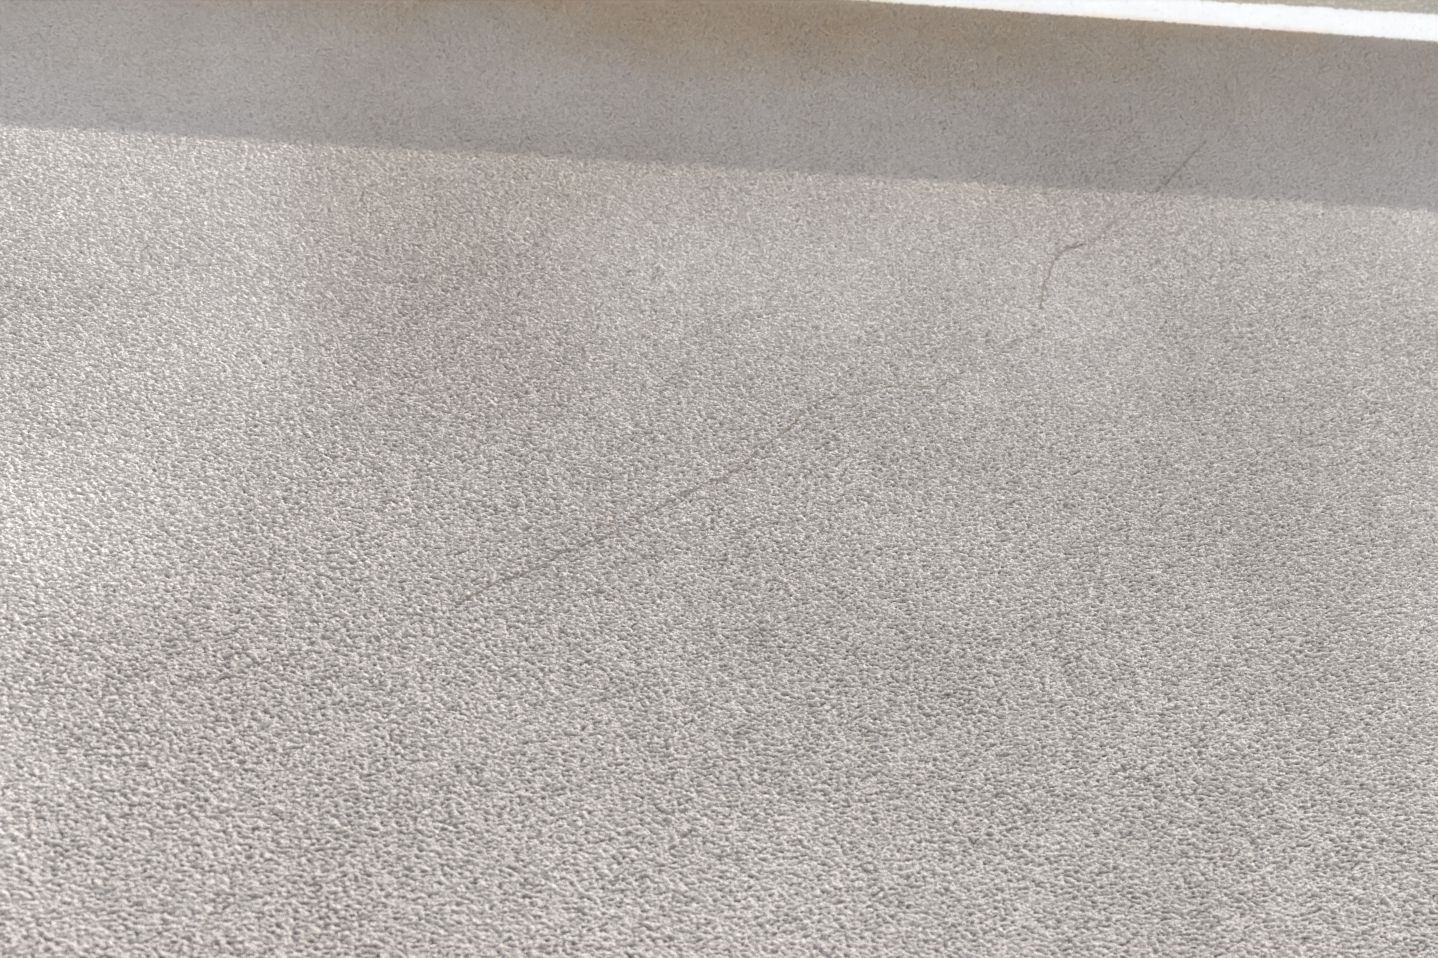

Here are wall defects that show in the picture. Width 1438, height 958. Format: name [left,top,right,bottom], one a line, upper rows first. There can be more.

crack [1000,140,1208,354]
crack [453,368,966,606]